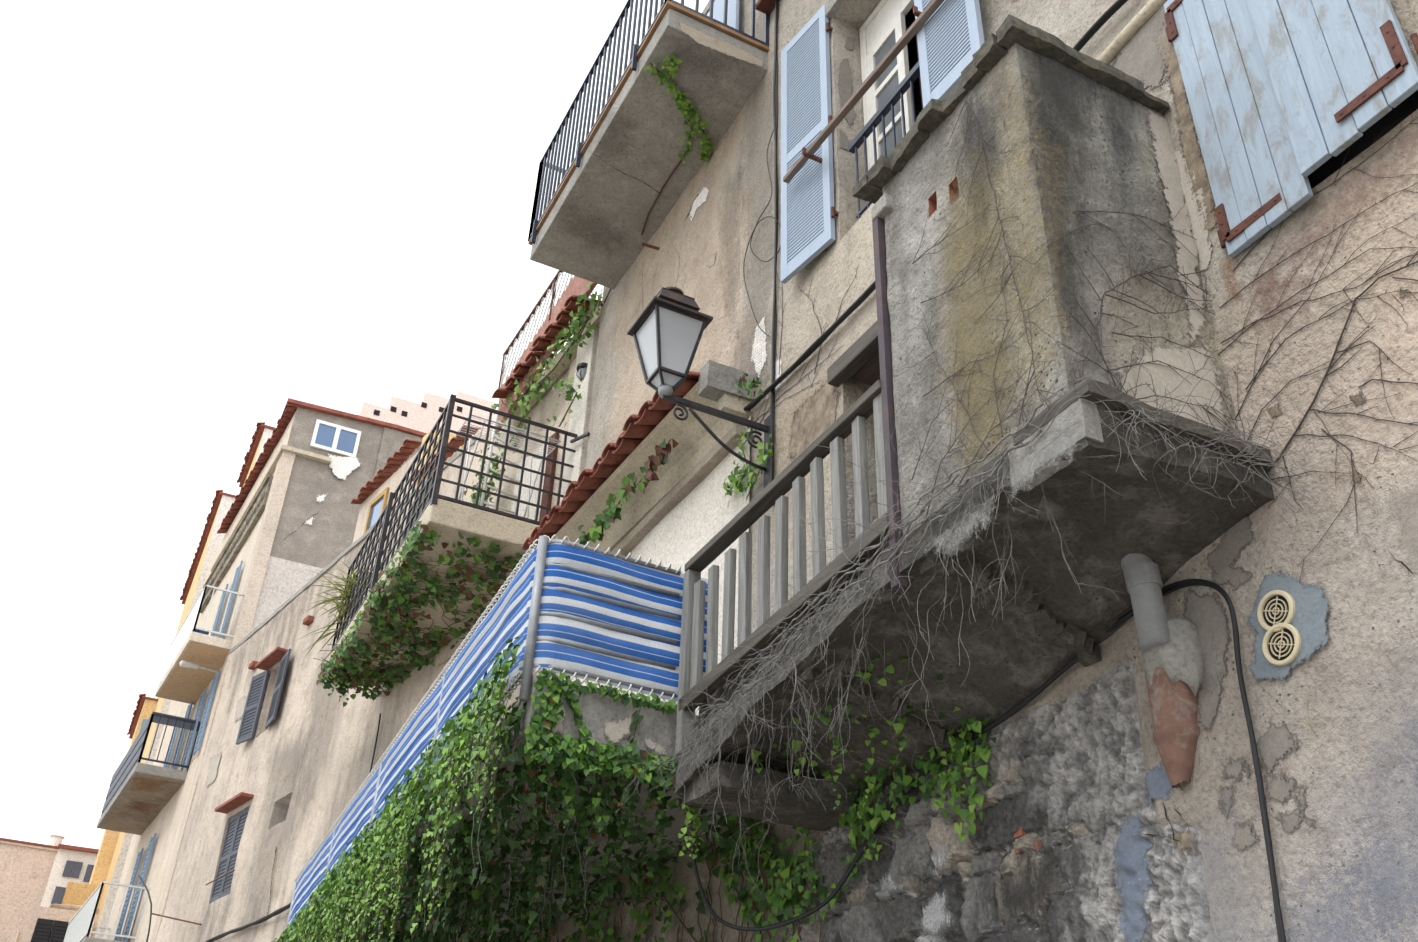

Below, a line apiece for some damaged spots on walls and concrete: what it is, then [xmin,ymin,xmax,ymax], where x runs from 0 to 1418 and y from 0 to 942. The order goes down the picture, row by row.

flaking render [689,187,709,221]
flaking render [328,454,360,480]
flaking render [1168,831,1199,856]